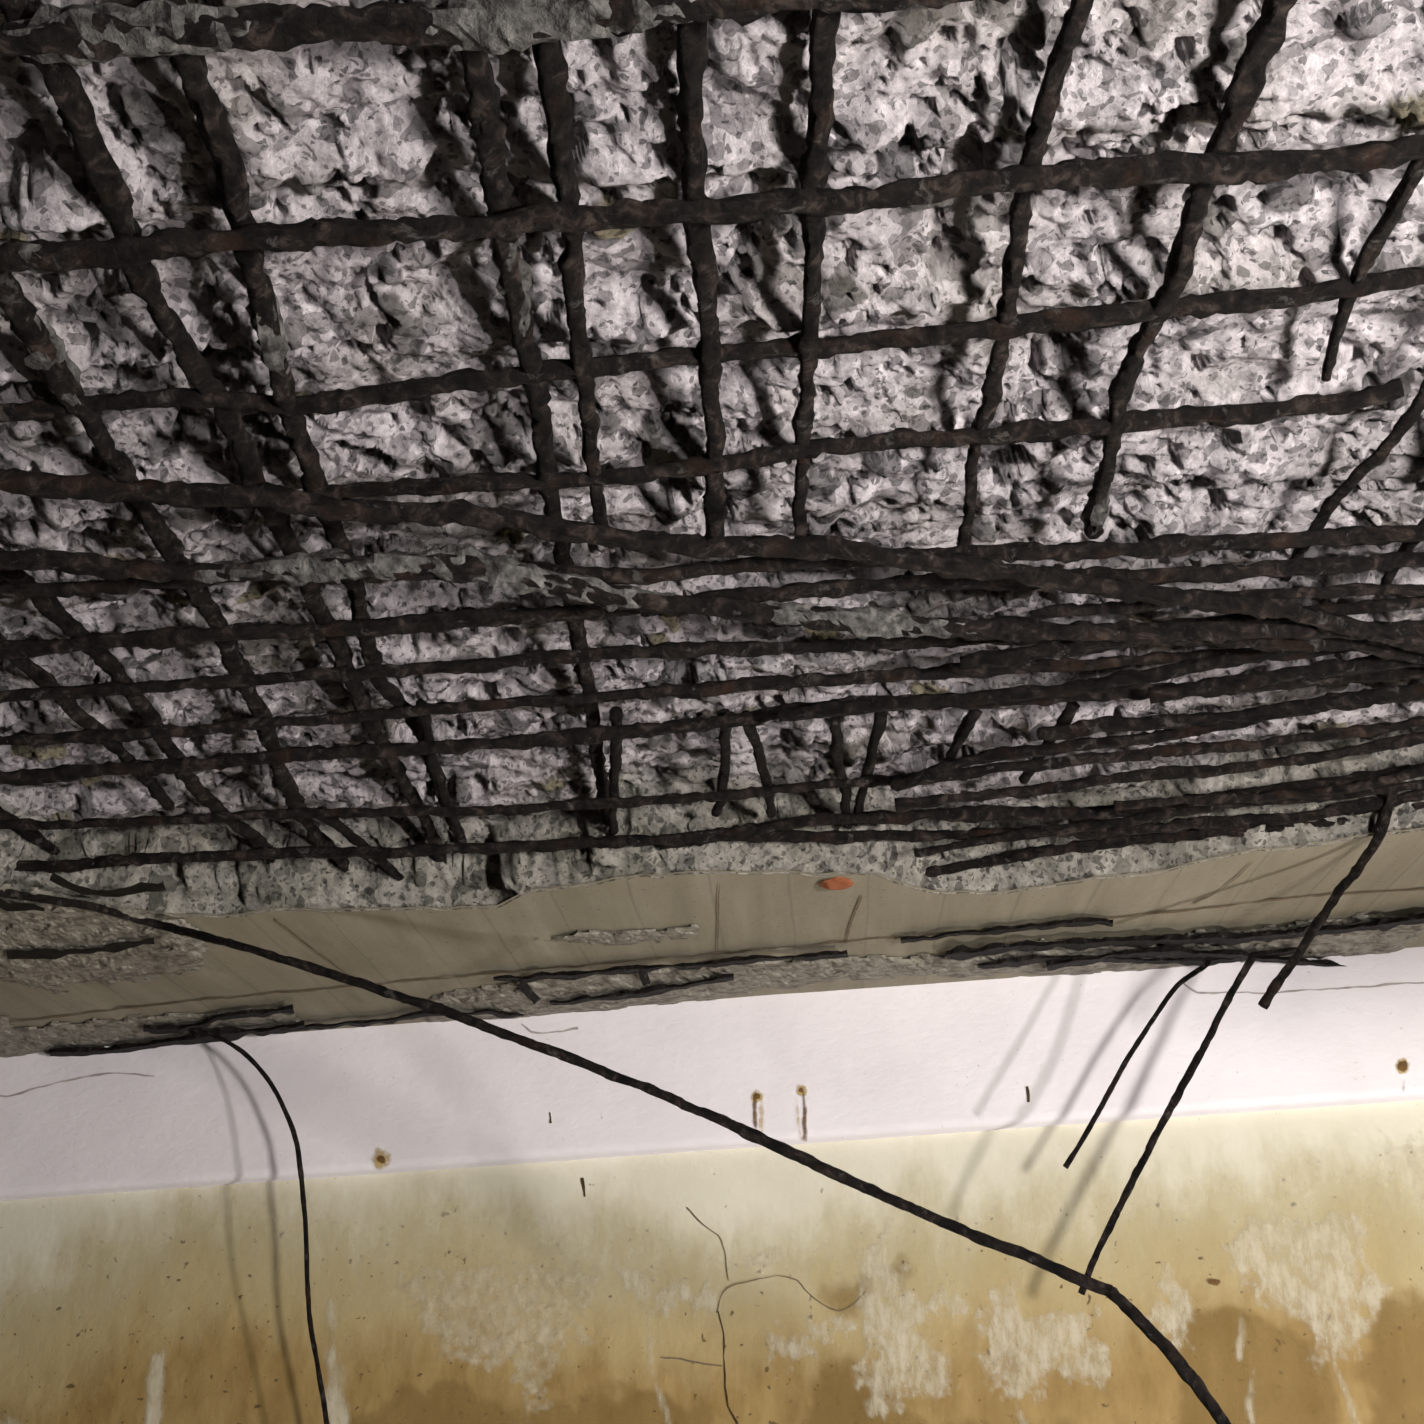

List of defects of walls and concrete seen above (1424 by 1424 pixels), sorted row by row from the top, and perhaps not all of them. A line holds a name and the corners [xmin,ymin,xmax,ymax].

spalling [0,0,1424,654]
spalling [0,543,1424,1424]
rust [819,877,854,890]
rust [752,1092,763,1127]
rust [797,1086,807,1141]
damp [0,1178,1424,1424]
crack [661,1207,866,1424]